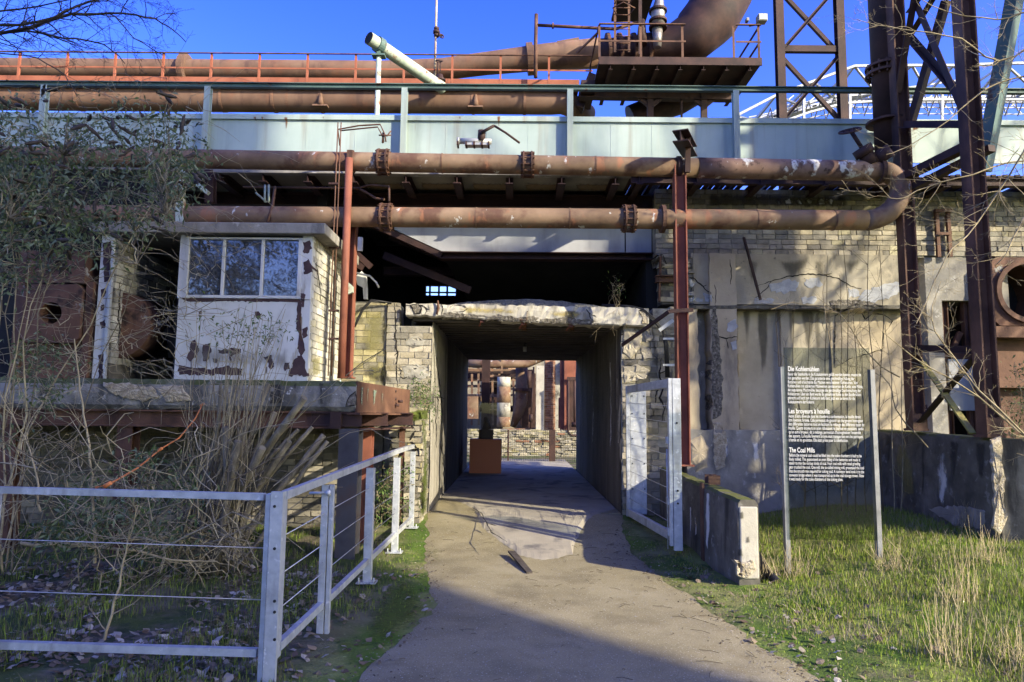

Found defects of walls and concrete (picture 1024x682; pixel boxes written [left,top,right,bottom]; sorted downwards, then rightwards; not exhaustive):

peeling [100,241,112,329]
peeling [303,240,318,274]
spalling [639,253,674,324]
crack [755,273,861,298]
peeling [182,293,310,377]
spalling [688,253,738,470]
leakage [745,312,767,360]
leakage [790,312,818,343]